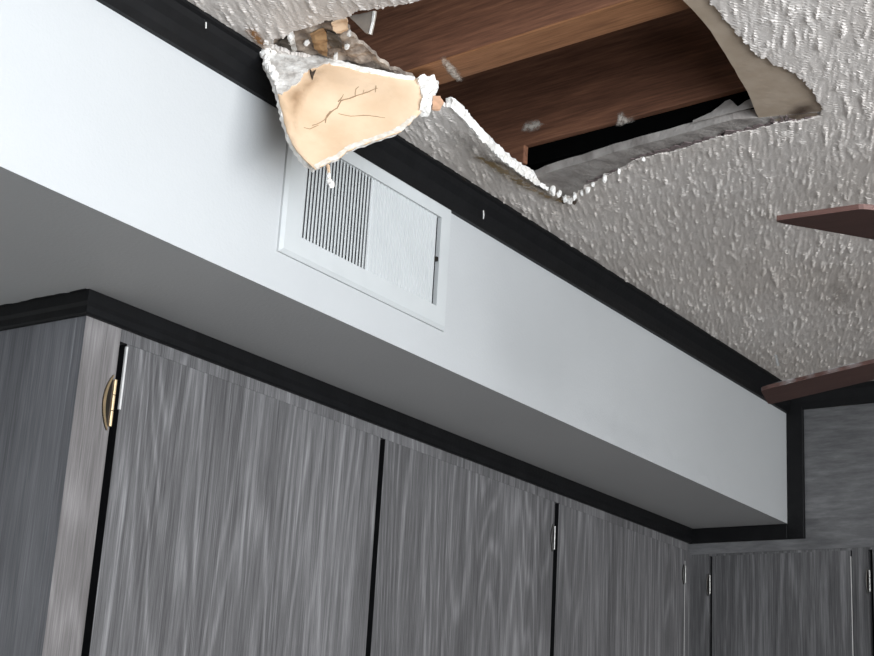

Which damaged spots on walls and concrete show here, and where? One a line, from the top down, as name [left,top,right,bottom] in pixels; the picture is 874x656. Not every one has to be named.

crack [304,86,385,129]
spalling [534,0,822,205]